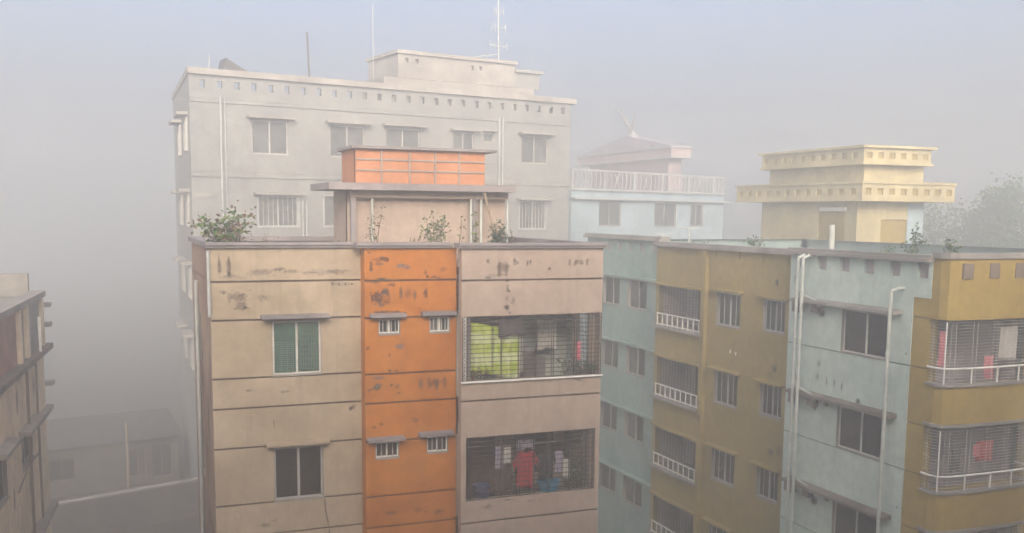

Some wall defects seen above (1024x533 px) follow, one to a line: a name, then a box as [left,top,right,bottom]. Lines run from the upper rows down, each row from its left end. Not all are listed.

peeling [371,288,406,313]